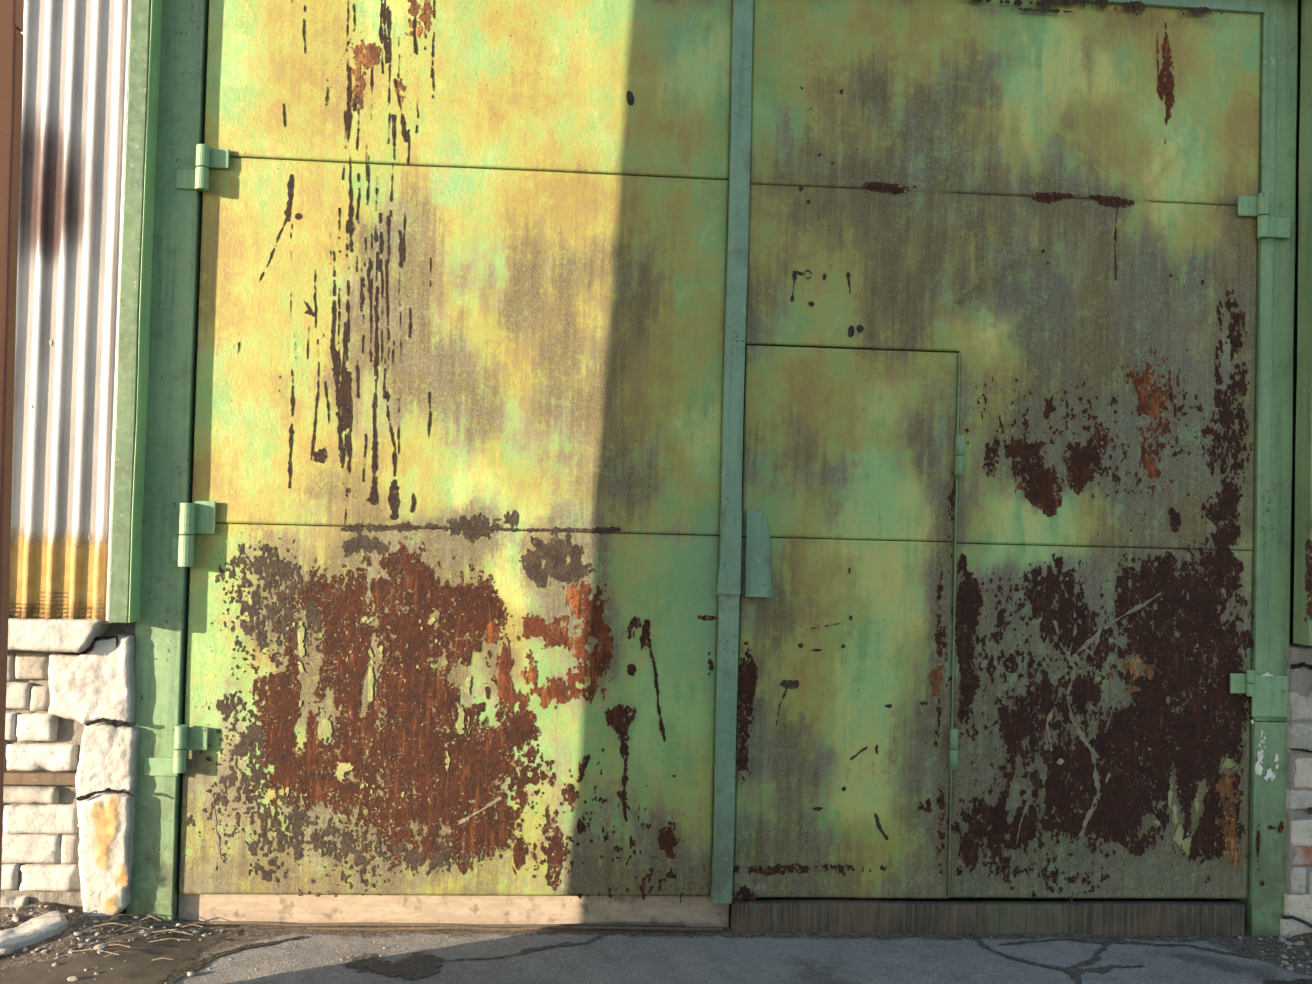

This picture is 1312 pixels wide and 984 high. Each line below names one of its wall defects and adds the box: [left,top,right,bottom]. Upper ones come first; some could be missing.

corrosion [405,0,434,37]
corrosion [347,36,381,109]
corrosion [1156,22,1175,145]
corrosion [946,288,1254,903]
crack [78,635,118,655]
crack [86,718,136,727]
corrosion [185,535,700,903]
crack [76,788,134,801]
corrosion [732,863,887,902]